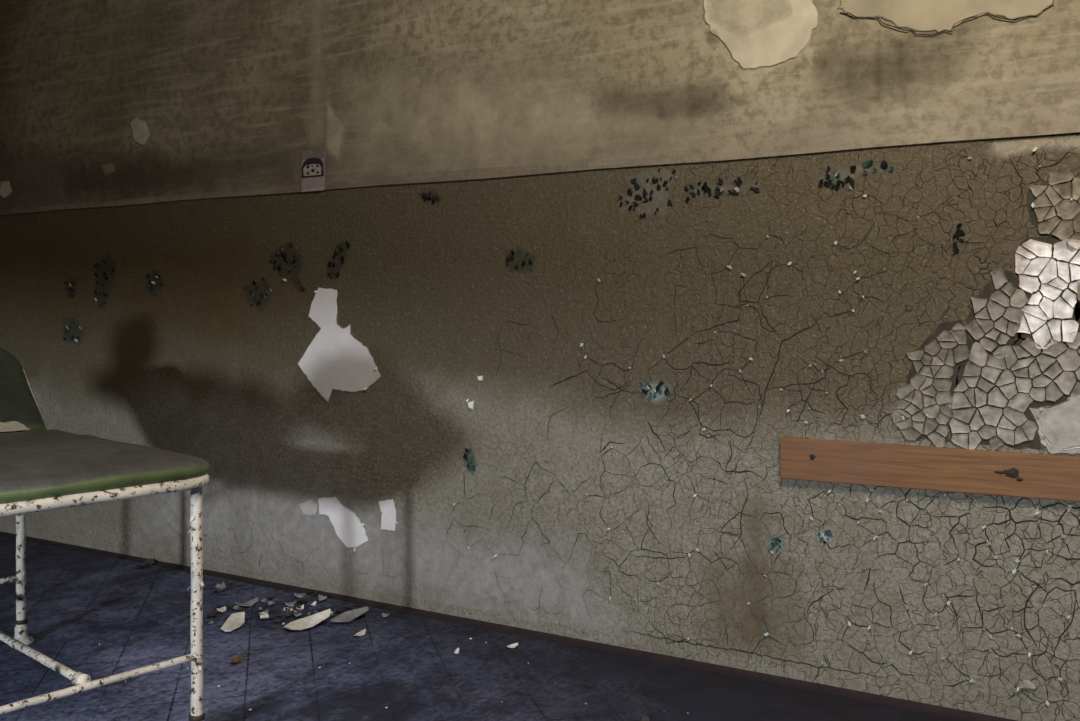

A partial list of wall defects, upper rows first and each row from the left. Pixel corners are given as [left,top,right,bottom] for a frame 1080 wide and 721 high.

spalling [703,0,819,69]
spalling [838,0,1054,37]
peeling [618,167,762,218]
peeling [243,240,381,402]
peeling [891,167,1080,454]
crack [446,144,1080,711]
peeling [299,496,368,552]
peeling [378,499,398,531]